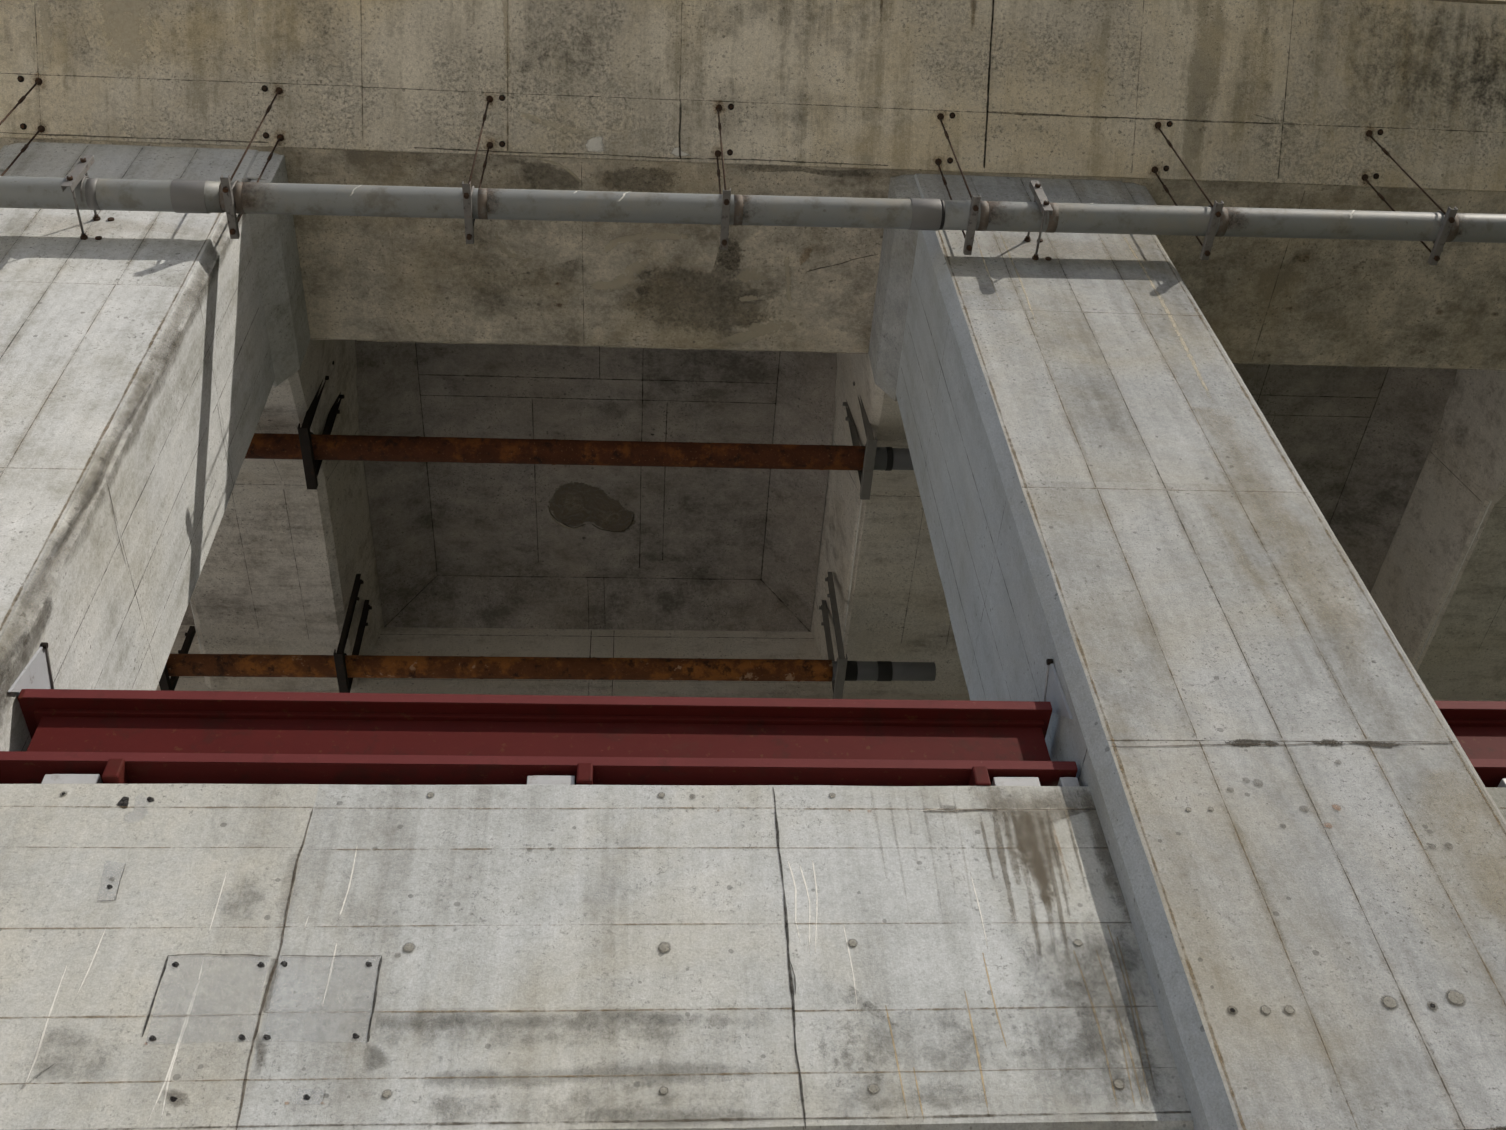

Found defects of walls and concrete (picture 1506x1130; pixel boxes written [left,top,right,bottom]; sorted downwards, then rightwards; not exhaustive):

crack [236,808,313,1130]
crack [773,788,806,1129]
water stain [788,860,818,951]
water stain [970,873,1006,1045]
water stain [921,795,1094,928]
water stain [1074,925,1154,1102]